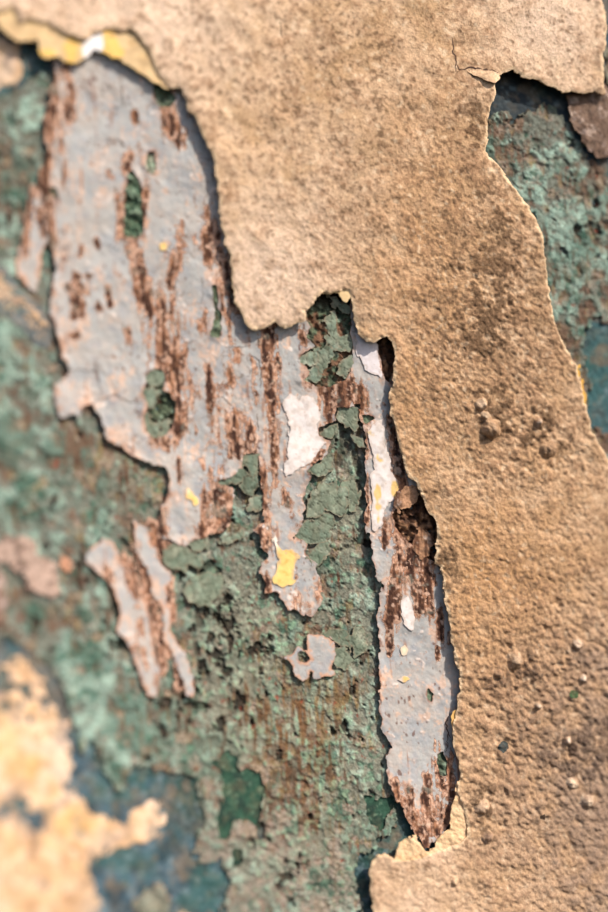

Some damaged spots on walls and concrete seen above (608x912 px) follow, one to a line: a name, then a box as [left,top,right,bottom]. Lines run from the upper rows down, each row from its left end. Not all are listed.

spalling [0,35,23,87]
peeling [565,83,608,159]
corrosion [65,271,114,340]
peeling [486,102,608,396]
corrosion [103,507,185,691]
peeling [0,49,400,912]
corrosion [115,188,292,593]
corrosion [386,414,408,491]
peeling [382,491,437,544]
peeling [365,514,460,817]
corrosion [379,507,451,661]
corrosion [389,739,456,848]